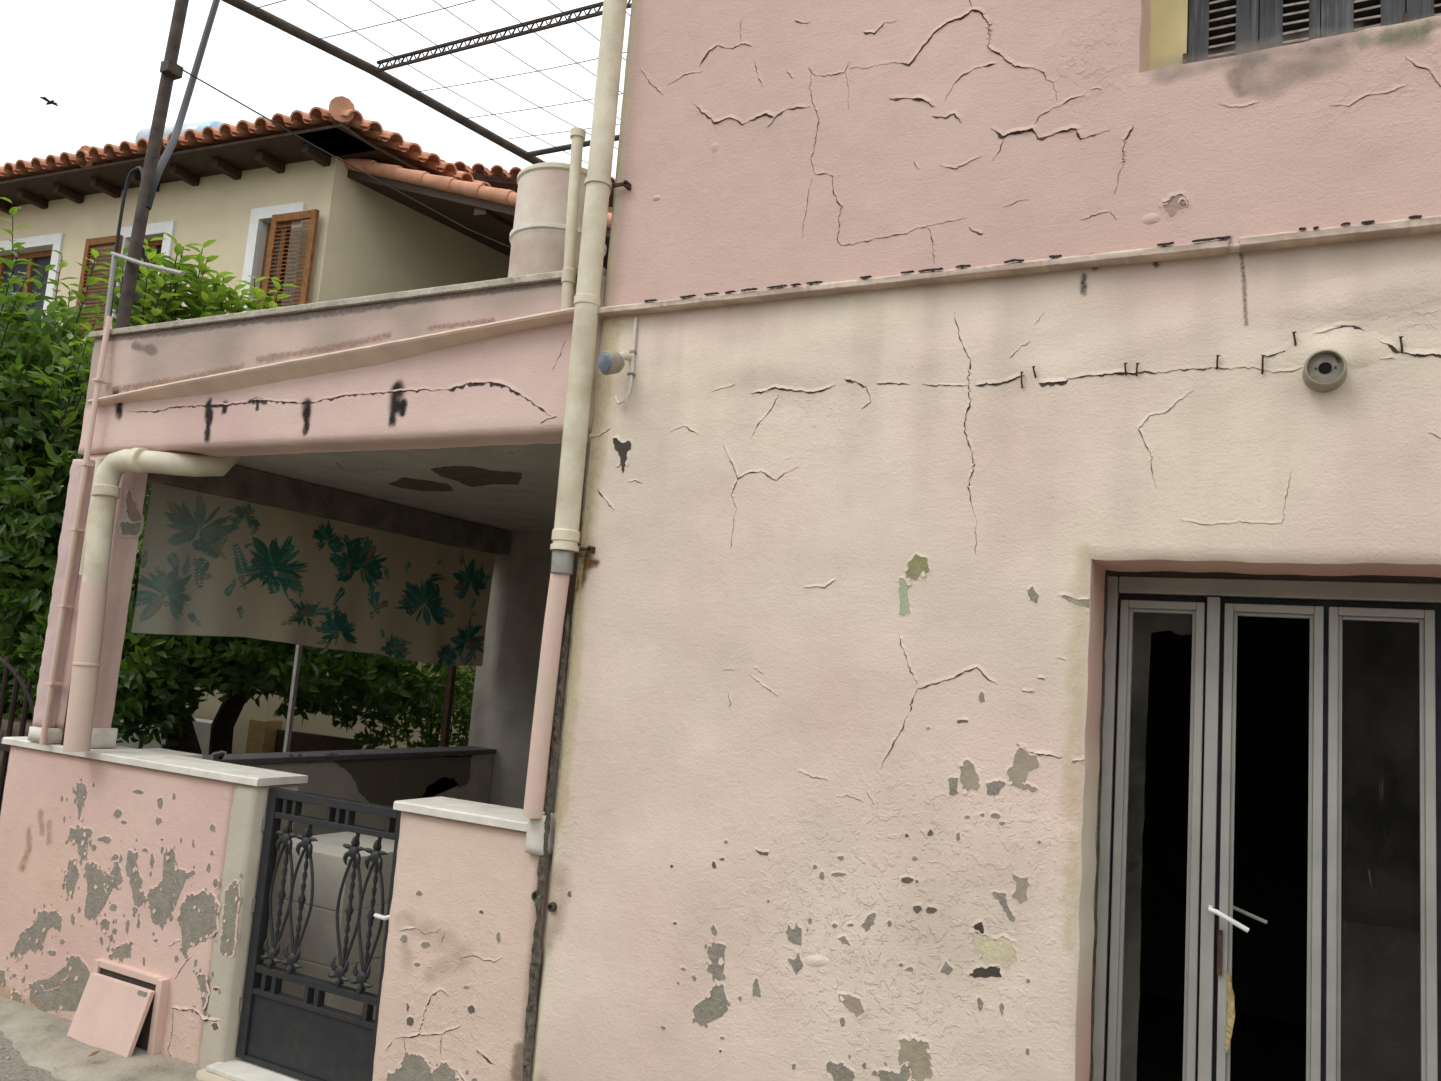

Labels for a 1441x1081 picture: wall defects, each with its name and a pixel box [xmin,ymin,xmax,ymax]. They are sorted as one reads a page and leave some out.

crack [640,0,1134,264]
damp [205,399,229,441]
crack [126,378,557,453]
damp [389,382,407,425]
crack [670,311,1441,554]
crack [797,632,1068,805]
flaking render [946,742,1042,842]
peeling [0,778,243,1032]
peeling [385,1050,479,1081]
crack [384,925,502,1081]
peeling [675,922,763,1054]
flaking render [824,1035,936,1081]